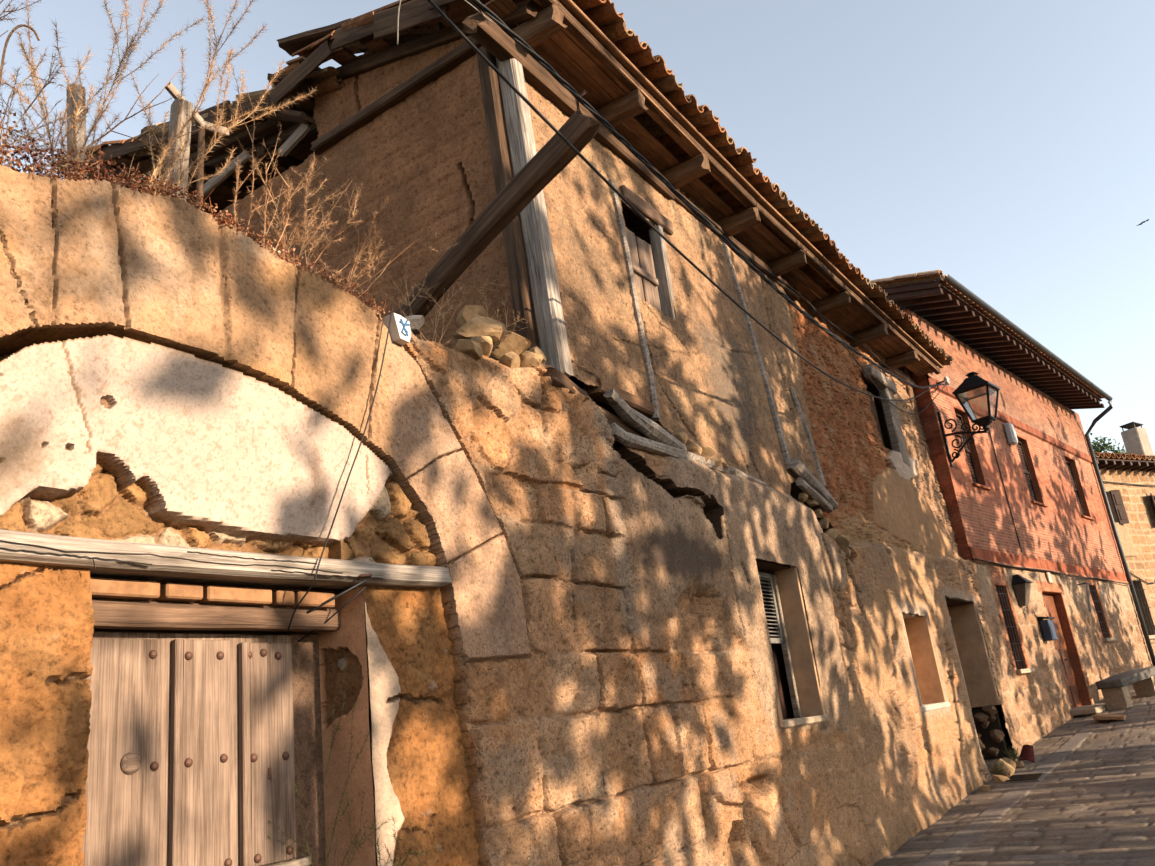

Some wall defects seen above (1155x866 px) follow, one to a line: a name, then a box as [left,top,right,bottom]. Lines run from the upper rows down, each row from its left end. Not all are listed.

spalling [100,394,117,408]
crack [0,229,442,552]
spalling [0,451,451,577]
crack [612,444,751,636]
crack [613,277,796,439]
peeling [785,280,964,560]